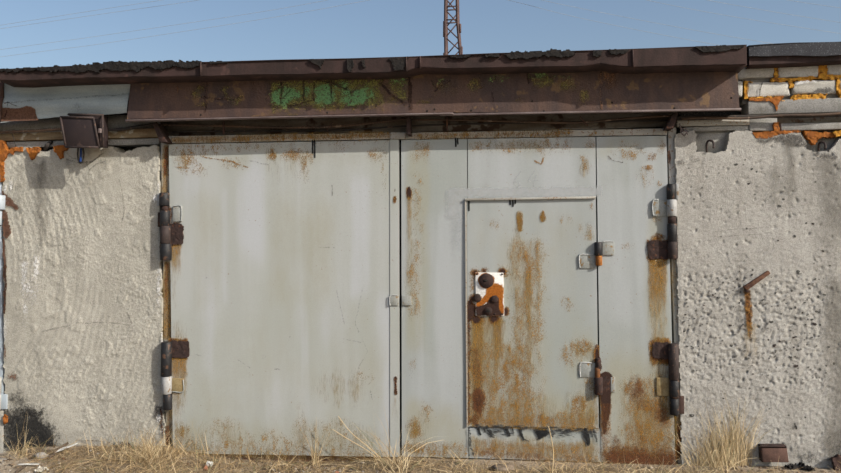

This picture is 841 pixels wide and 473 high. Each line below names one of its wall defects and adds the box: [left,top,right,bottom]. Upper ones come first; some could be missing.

rust [162,131,390,193]
spalling [757,133,806,147]
rust [164,244,187,342]
rust [406,175,423,318]
rust [402,233,682,465]
rust [744,289,753,338]
spalling [682,269,835,383]